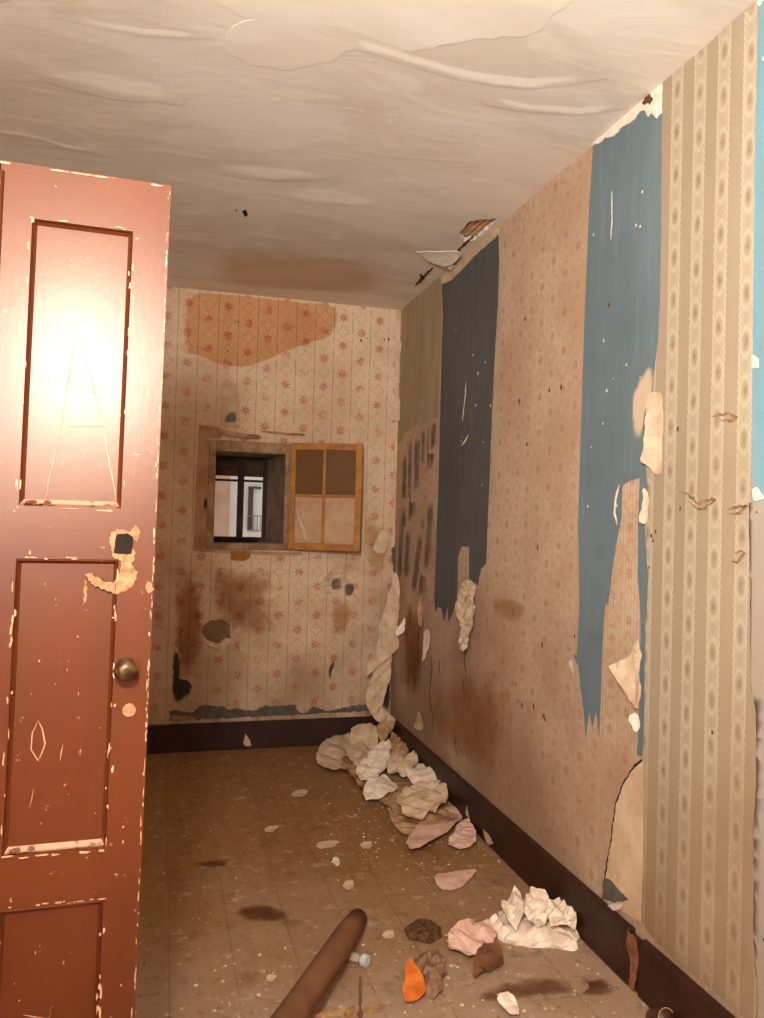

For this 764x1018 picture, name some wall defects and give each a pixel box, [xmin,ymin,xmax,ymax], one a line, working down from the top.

peeling [52,5,213,39]
peeling [10,65,185,105]
peeling [751,0,764,502]
leakage [180,240,412,369]
peeling [213,0,663,921]
peeling [83,525,155,621]
peeling [201,619,244,651]
leakage [170,559,283,706]
leakage [330,578,355,639]
leakage [361,418,529,788]
peeling [169,704,369,721]
peeling [626,931,639,991]